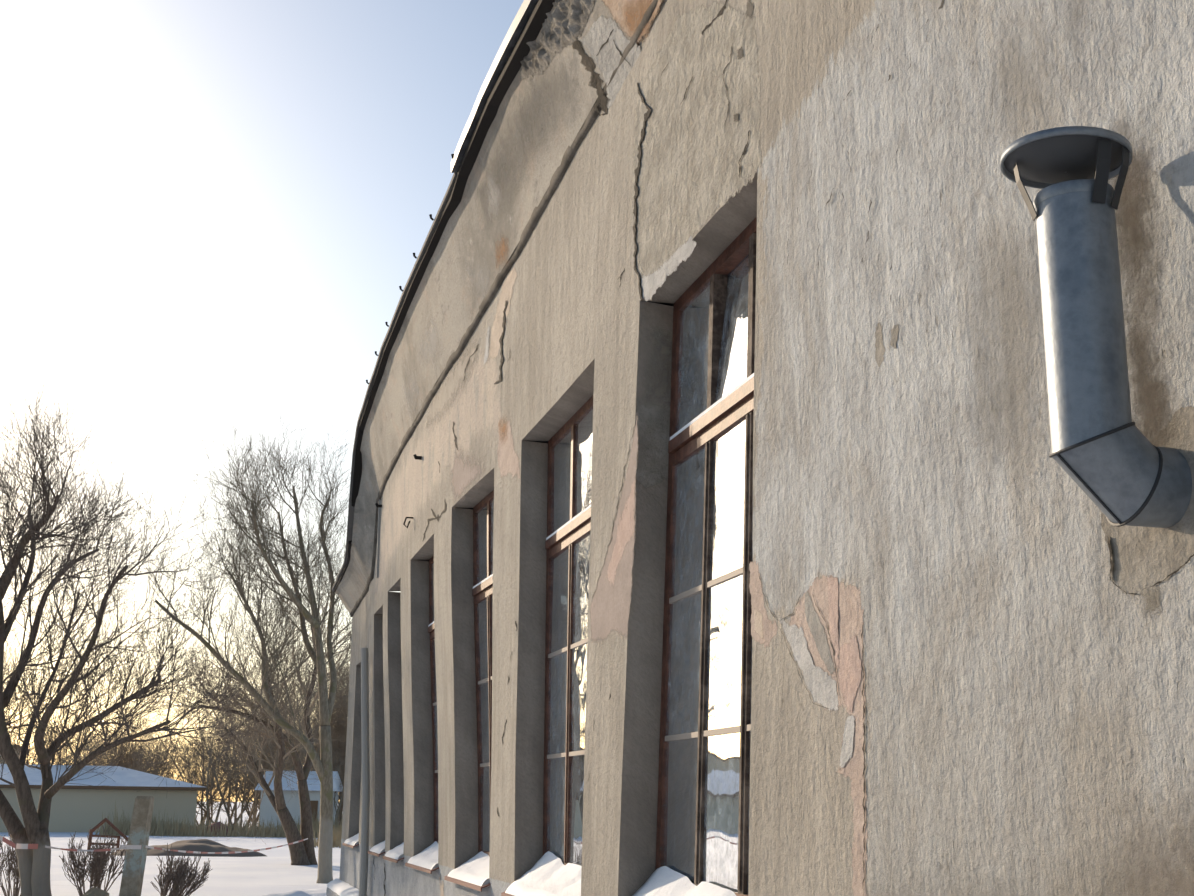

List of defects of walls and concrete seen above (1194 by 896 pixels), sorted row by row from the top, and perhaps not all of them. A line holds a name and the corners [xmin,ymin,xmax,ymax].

crack [572,40,609,116]
flaking render [519,0,762,301]
crack [423,501,447,540]
flaking render [590,341,672,641]
flaking render [1101,406,1194,613]
flaking render [749,561,868,896]